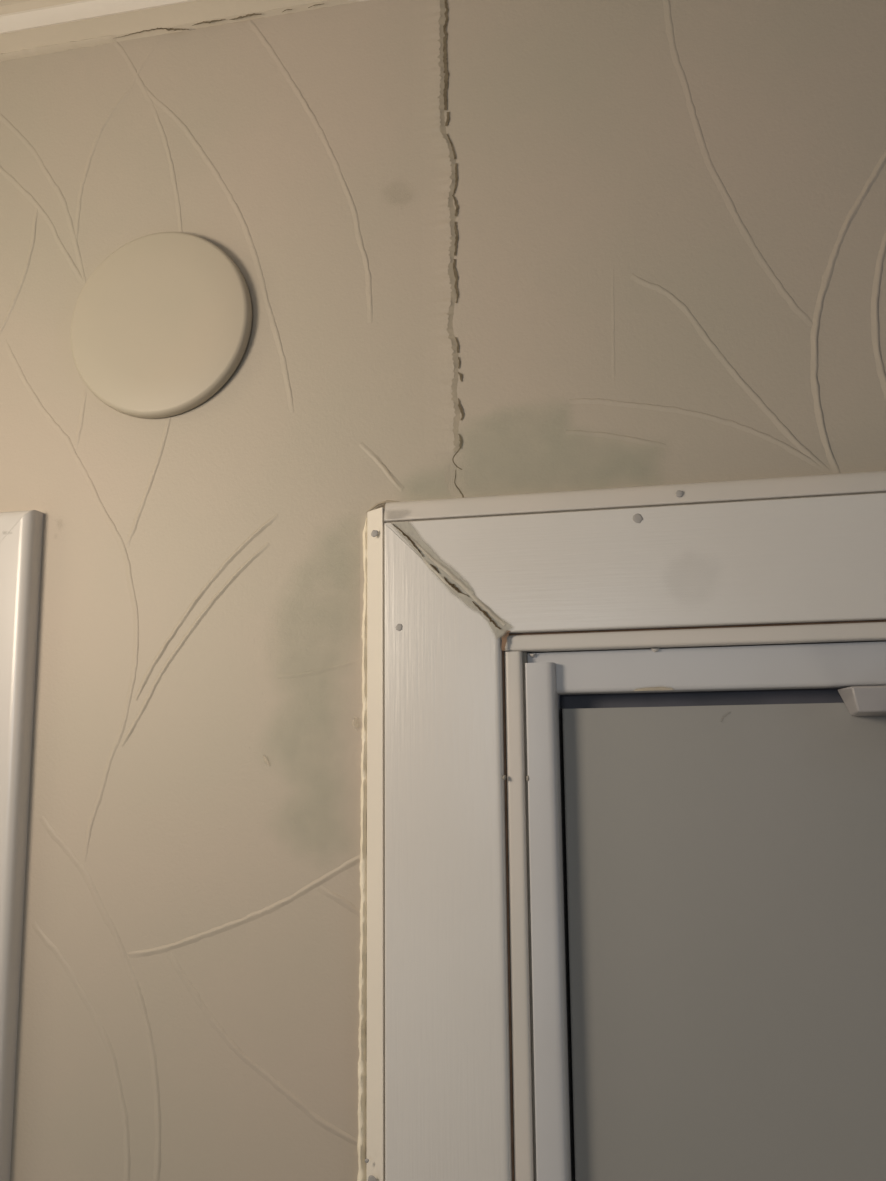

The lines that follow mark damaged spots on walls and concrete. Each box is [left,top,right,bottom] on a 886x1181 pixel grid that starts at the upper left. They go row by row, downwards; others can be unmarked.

crack [116,4,321,38]
crack [412,0,464,498]